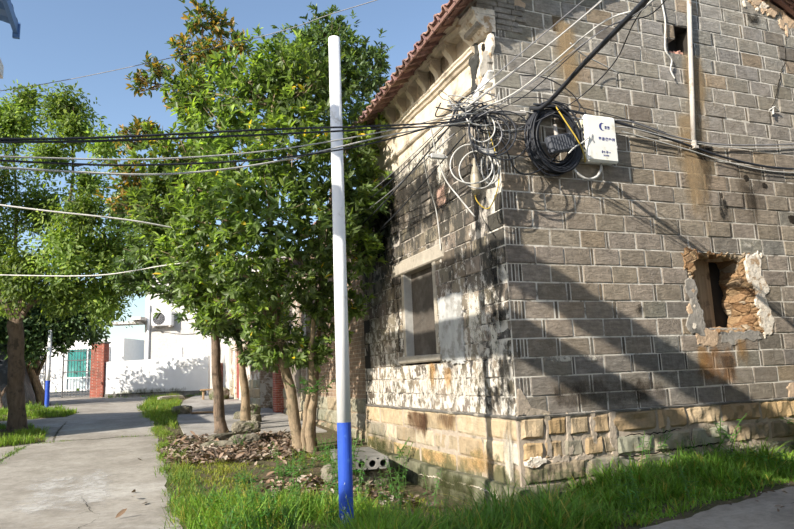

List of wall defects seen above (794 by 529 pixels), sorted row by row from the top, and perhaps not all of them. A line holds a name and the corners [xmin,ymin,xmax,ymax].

spalling [742,0,789,37]
flaking render [468,33,495,109]
crack [771,37,789,108]
leakage [467,123,493,208]
leakage [372,161,451,265]
leakage [489,245,503,329]
spalling [680,247,775,348]
peeling [437,283,499,397]
leakage [477,350,511,408]